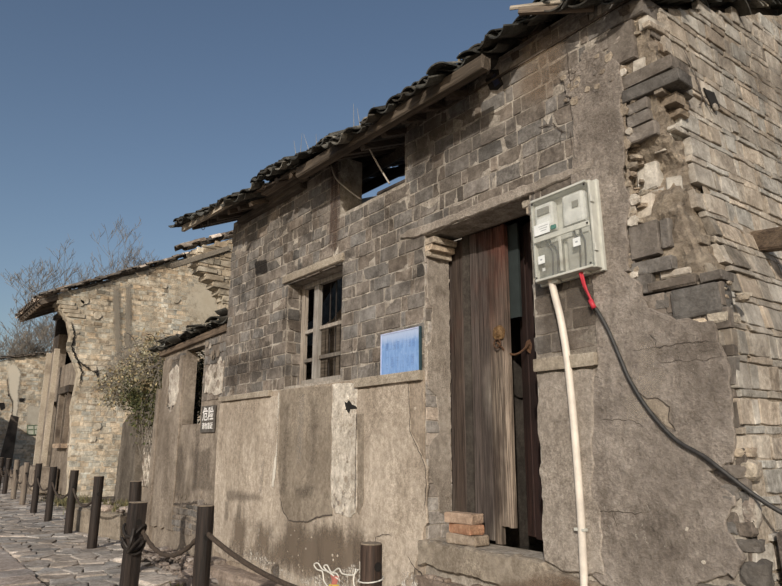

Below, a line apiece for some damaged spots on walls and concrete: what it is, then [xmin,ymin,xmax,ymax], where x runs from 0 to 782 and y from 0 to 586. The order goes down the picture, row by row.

spalling [560,0,753,324]
crack [71,324,95,386]
flaking render [165,353,186,413]
flaking render [201,333,227,401]
crack [633,334,718,363]
flaking render [278,383,364,523]
flaking render [172,489,211,536]
water stain [232,519,363,586]